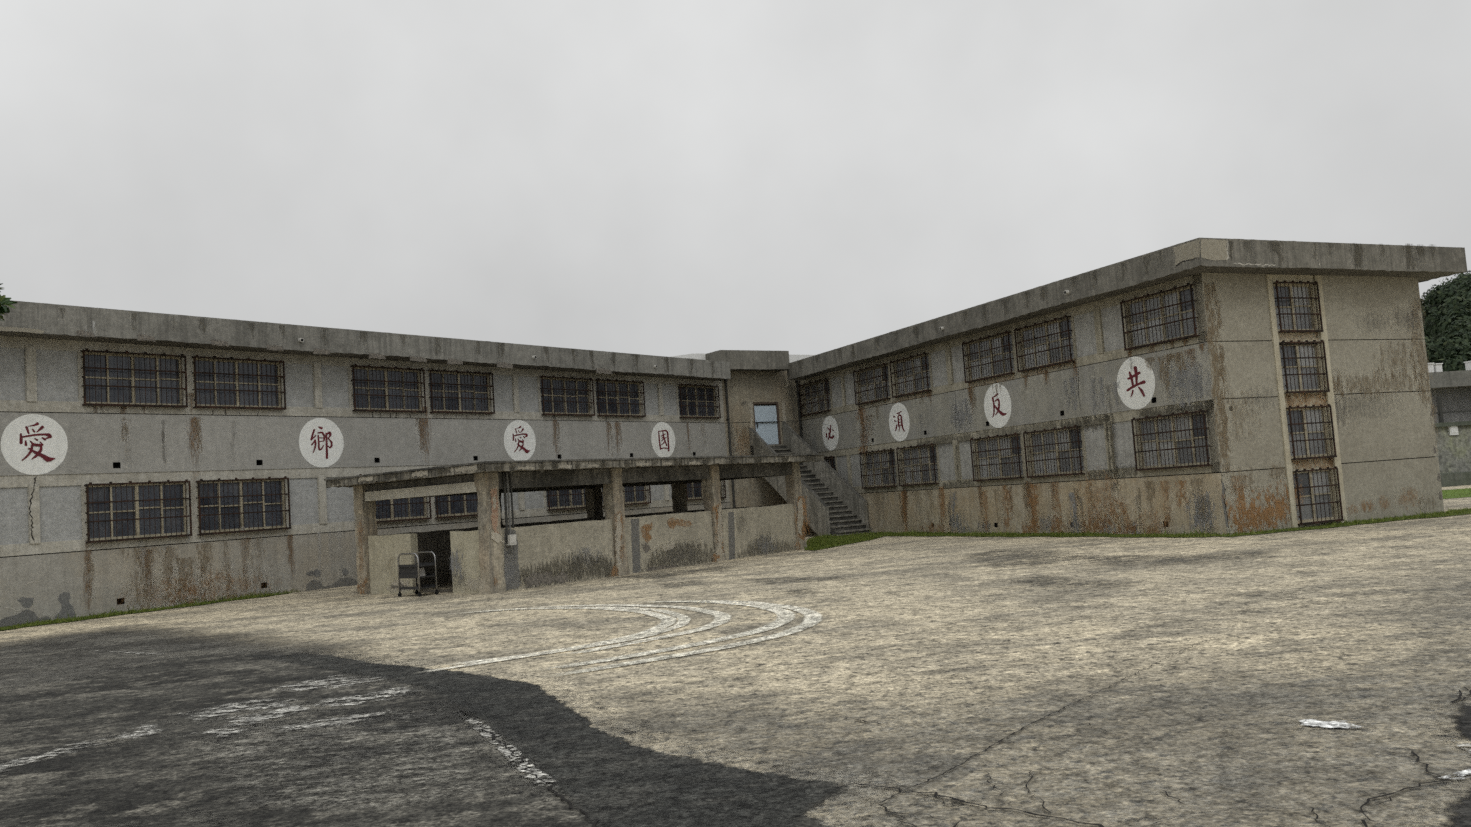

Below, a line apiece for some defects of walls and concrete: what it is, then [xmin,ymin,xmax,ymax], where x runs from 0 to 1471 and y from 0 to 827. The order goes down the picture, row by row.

corrosion [1222,482,1303,534]
crack [1450,687,1471,704]
crack [852,637,1215,827]
crack [1142,789,1276,827]
crack [1311,751,1449,827]